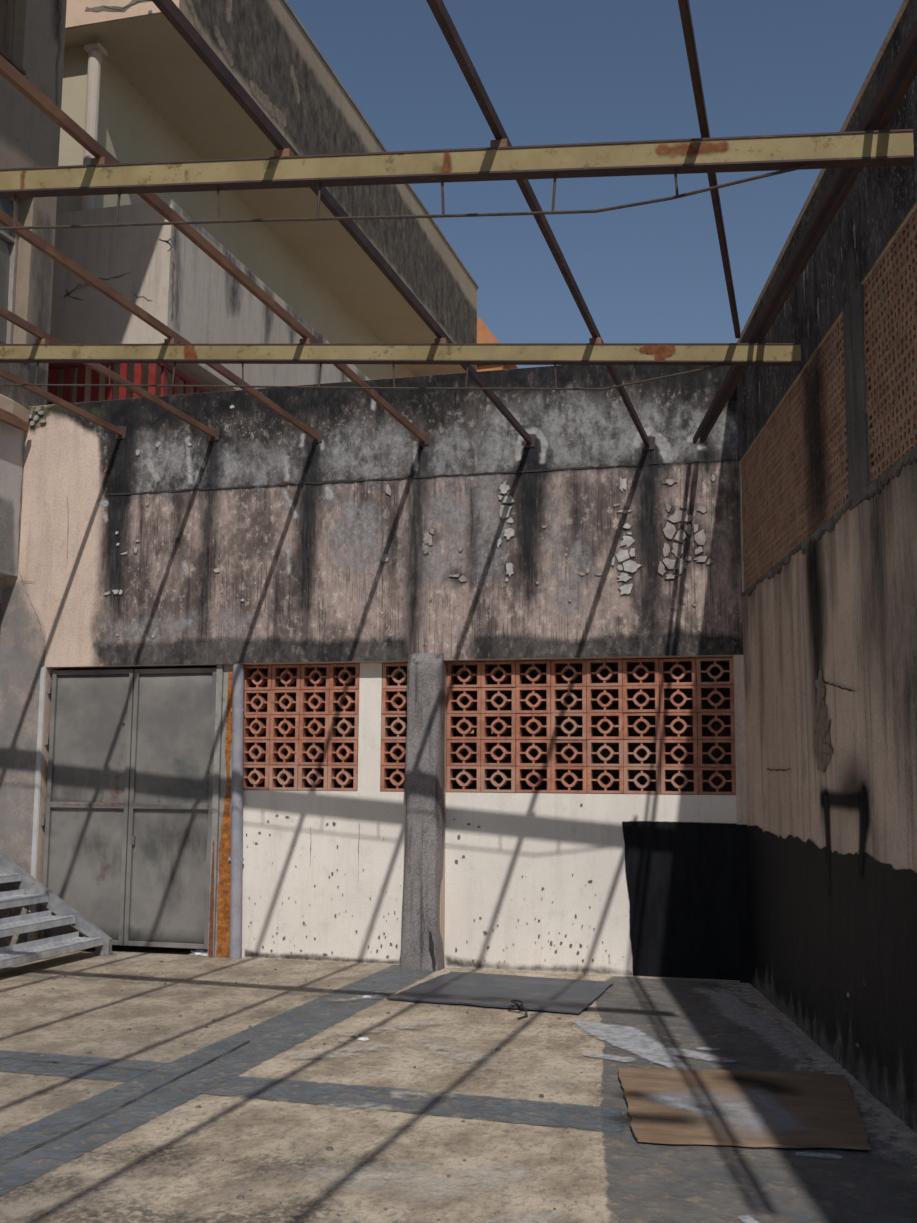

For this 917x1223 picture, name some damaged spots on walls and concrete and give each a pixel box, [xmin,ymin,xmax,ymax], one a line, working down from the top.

crack [27,0,152,106]
leakage [191,0,368,155]
leakage [844,0,917,132]
corrosion [656,141,728,155]
leakage [0,74,917,666]
corrosion [639,345,675,360]
flaking render [497,481,515,548]
flaking render [579,477,642,595]
flaking render [658,504,714,579]
leakage [807,540,824,712]
corrosion [208,670,233,958]